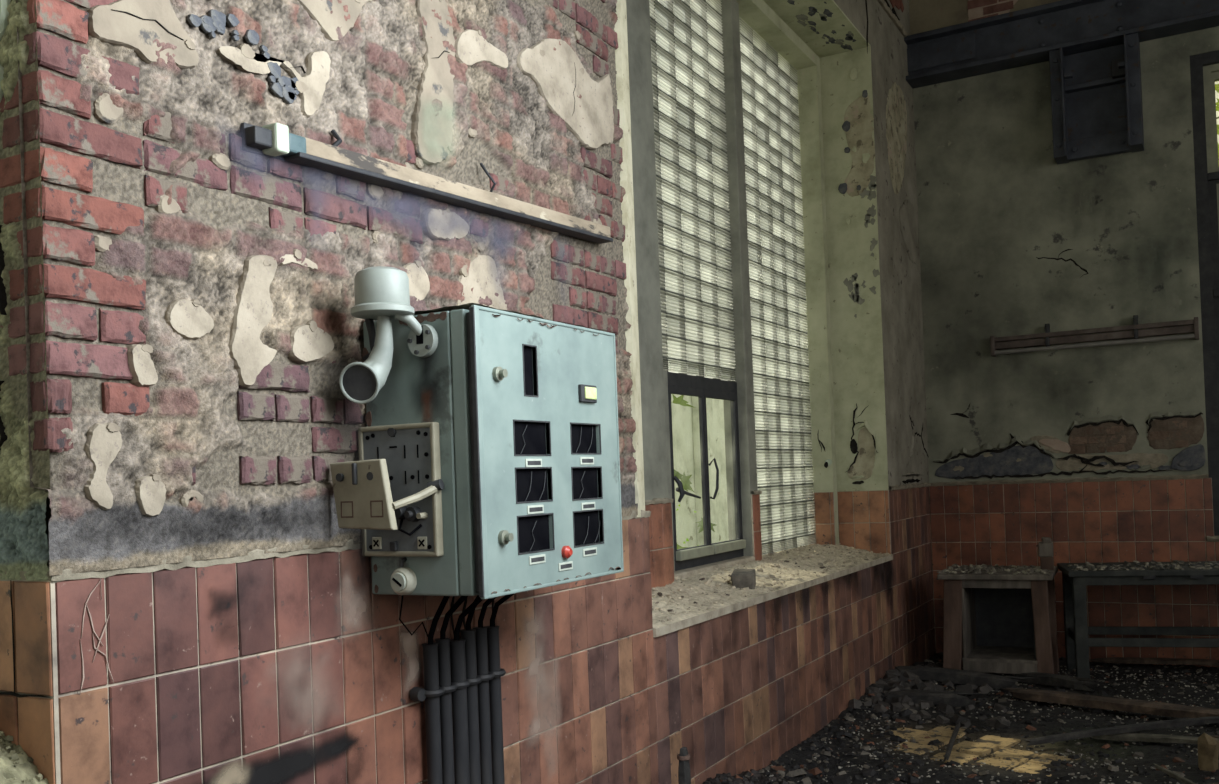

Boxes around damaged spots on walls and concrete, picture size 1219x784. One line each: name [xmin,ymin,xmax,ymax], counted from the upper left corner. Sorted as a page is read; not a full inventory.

spalling [967,0,1018,22]
flaking render [405,0,625,242]
crack [0,225,8,315]
spalling [0,0,509,517]
spalling [550,240,627,347]
crack [1036,249,1089,278]
crack [0,381,8,450]
spalling [848,419,876,484]
spalling [1030,411,1206,471]
crack [0,580,50,698]
crack [79,578,114,695]